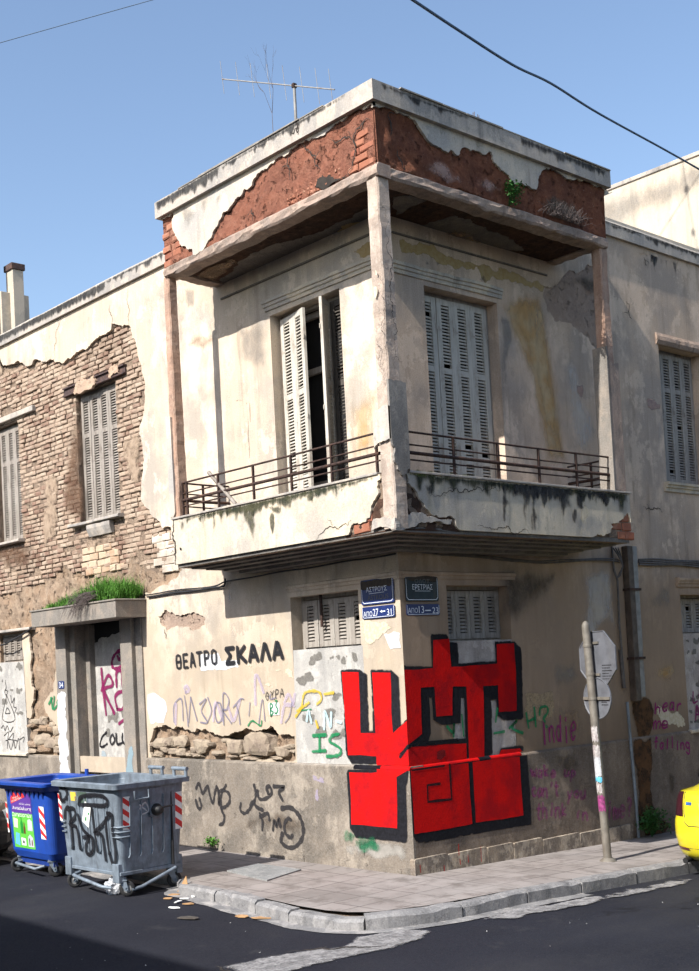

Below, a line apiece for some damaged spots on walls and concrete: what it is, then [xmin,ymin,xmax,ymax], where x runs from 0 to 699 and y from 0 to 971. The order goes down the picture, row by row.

flaking render [0,324,182,755]